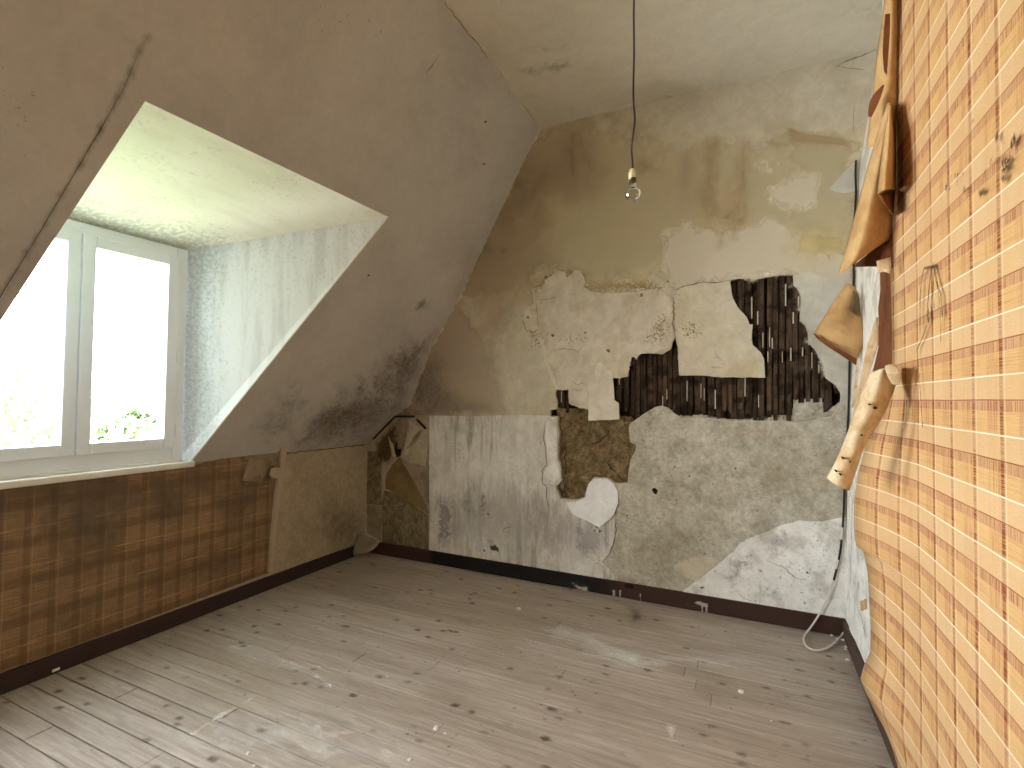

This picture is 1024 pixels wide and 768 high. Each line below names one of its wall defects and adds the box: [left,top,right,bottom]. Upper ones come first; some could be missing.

water stain [466,121,860,295]
peeling [829,155,862,193]
water stain [324,307,495,427]
flaking render [429,219,871,661]